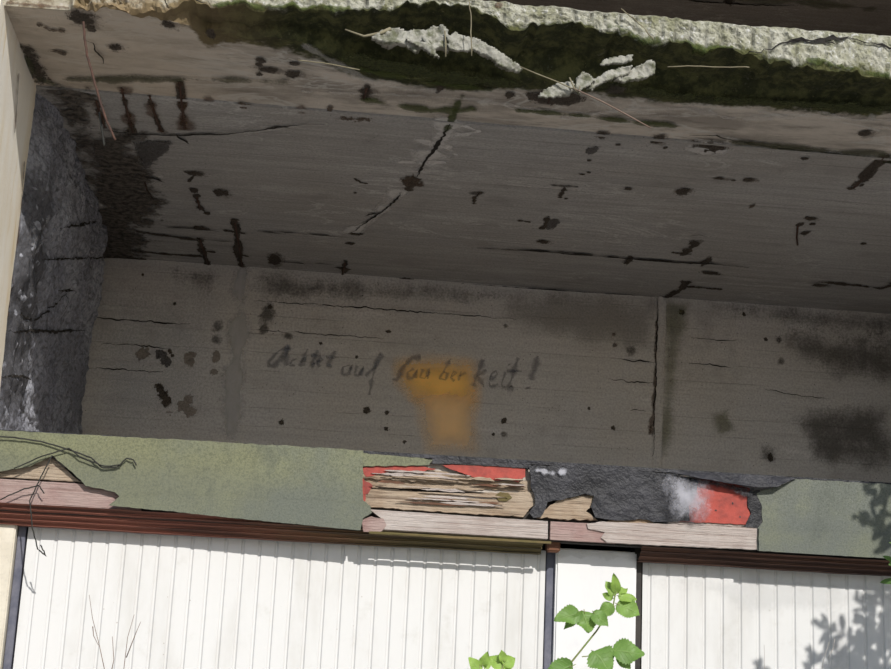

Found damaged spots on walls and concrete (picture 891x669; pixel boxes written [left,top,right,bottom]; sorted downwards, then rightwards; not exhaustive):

spalling [64,8,104,64]
spalling [254,57,300,78]
crack [743,34,891,57]
spalling [505,89,586,106]
crack [91,124,321,144]
crack [417,124,450,177]
crack [149,226,229,242]
crack [257,192,401,245]
crack [462,283,658,456]
leakage [806,414,889,460]
peeling [363,464,525,501]
peeling [679,480,750,525]